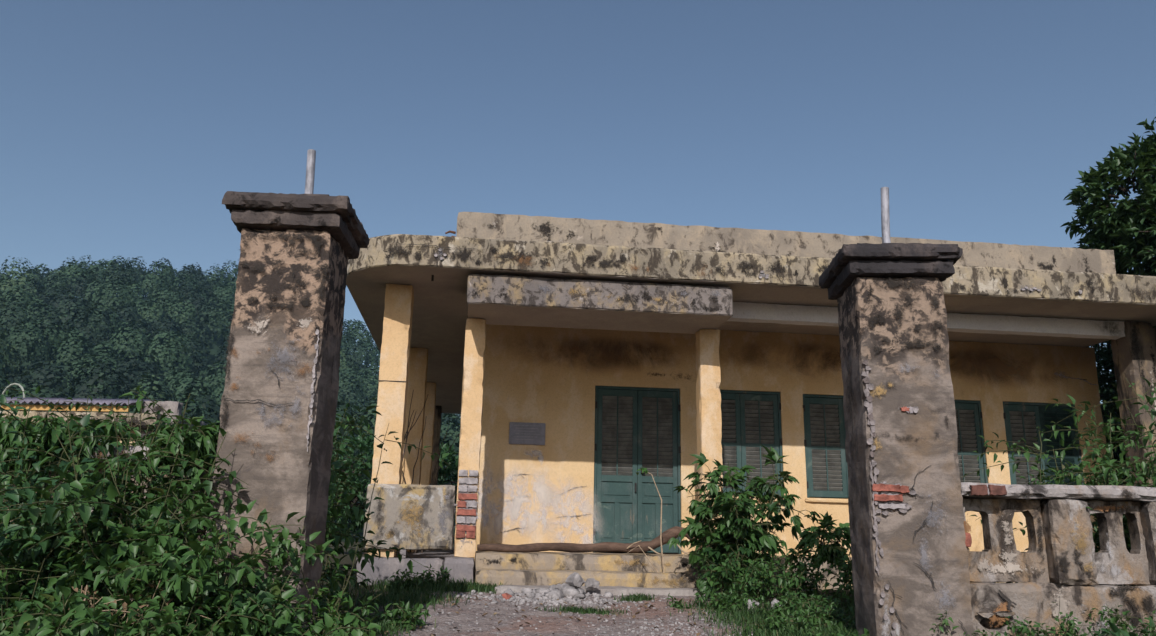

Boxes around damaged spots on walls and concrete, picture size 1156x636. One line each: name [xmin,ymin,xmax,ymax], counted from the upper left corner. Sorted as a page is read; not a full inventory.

mould [534,222,578,241]
mould [241,231,331,310]
water stain [384,246,421,264]
mould [450,246,549,269]
mould [583,252,626,269]
mould [710,245,798,279]
water stain [617,290,651,305]
water stain [681,292,719,312]
water stain [866,277,943,354]
spalling [454,470,591,545]
spalling [861,359,916,636]
spalling [976,603,1024,636]